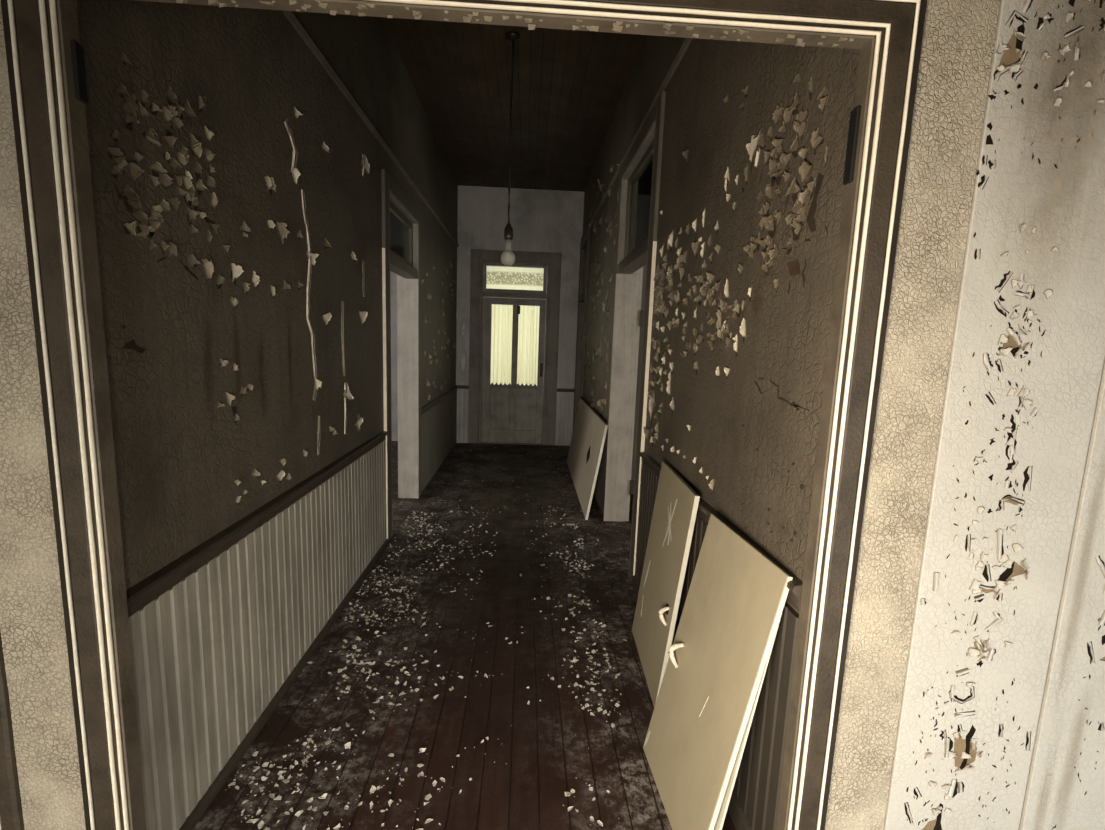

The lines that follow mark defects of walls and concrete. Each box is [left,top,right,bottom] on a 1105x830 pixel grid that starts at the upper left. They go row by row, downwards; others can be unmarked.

peeling [988,10,1038,109]
peeling [361,154,370,177]
peeling [723,73,830,295]
peeling [107,82,364,457]
peeling [643,210,752,491]
peeling [972,271,1052,390]
peeling [235,458,291,505]
peeling [1095,556,1105,595]
flaking render [904,465,1031,830]
peeling [1084,610,1105,679]